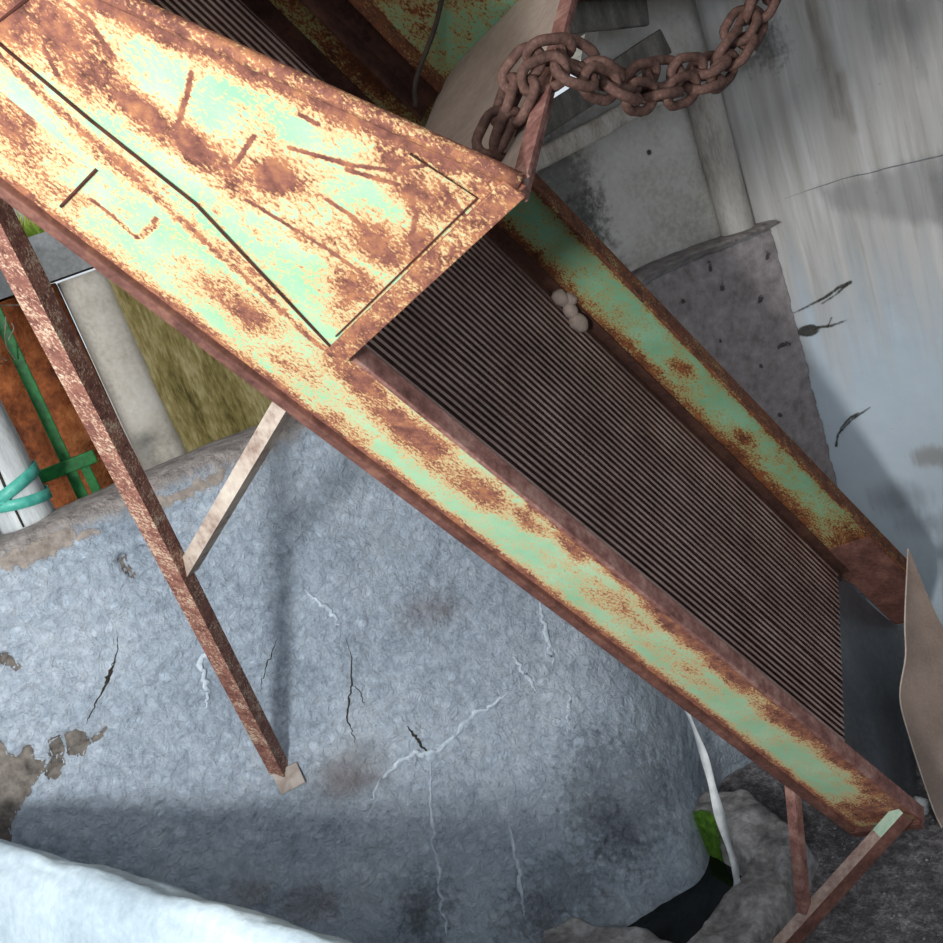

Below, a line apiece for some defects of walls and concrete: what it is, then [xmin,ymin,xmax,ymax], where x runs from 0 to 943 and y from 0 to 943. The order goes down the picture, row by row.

crack [784,155,943,199]
spalling [0,652,22,671]
crack [86,637,119,724]
crack [346,639,365,743]
spalling [0,726,107,842]